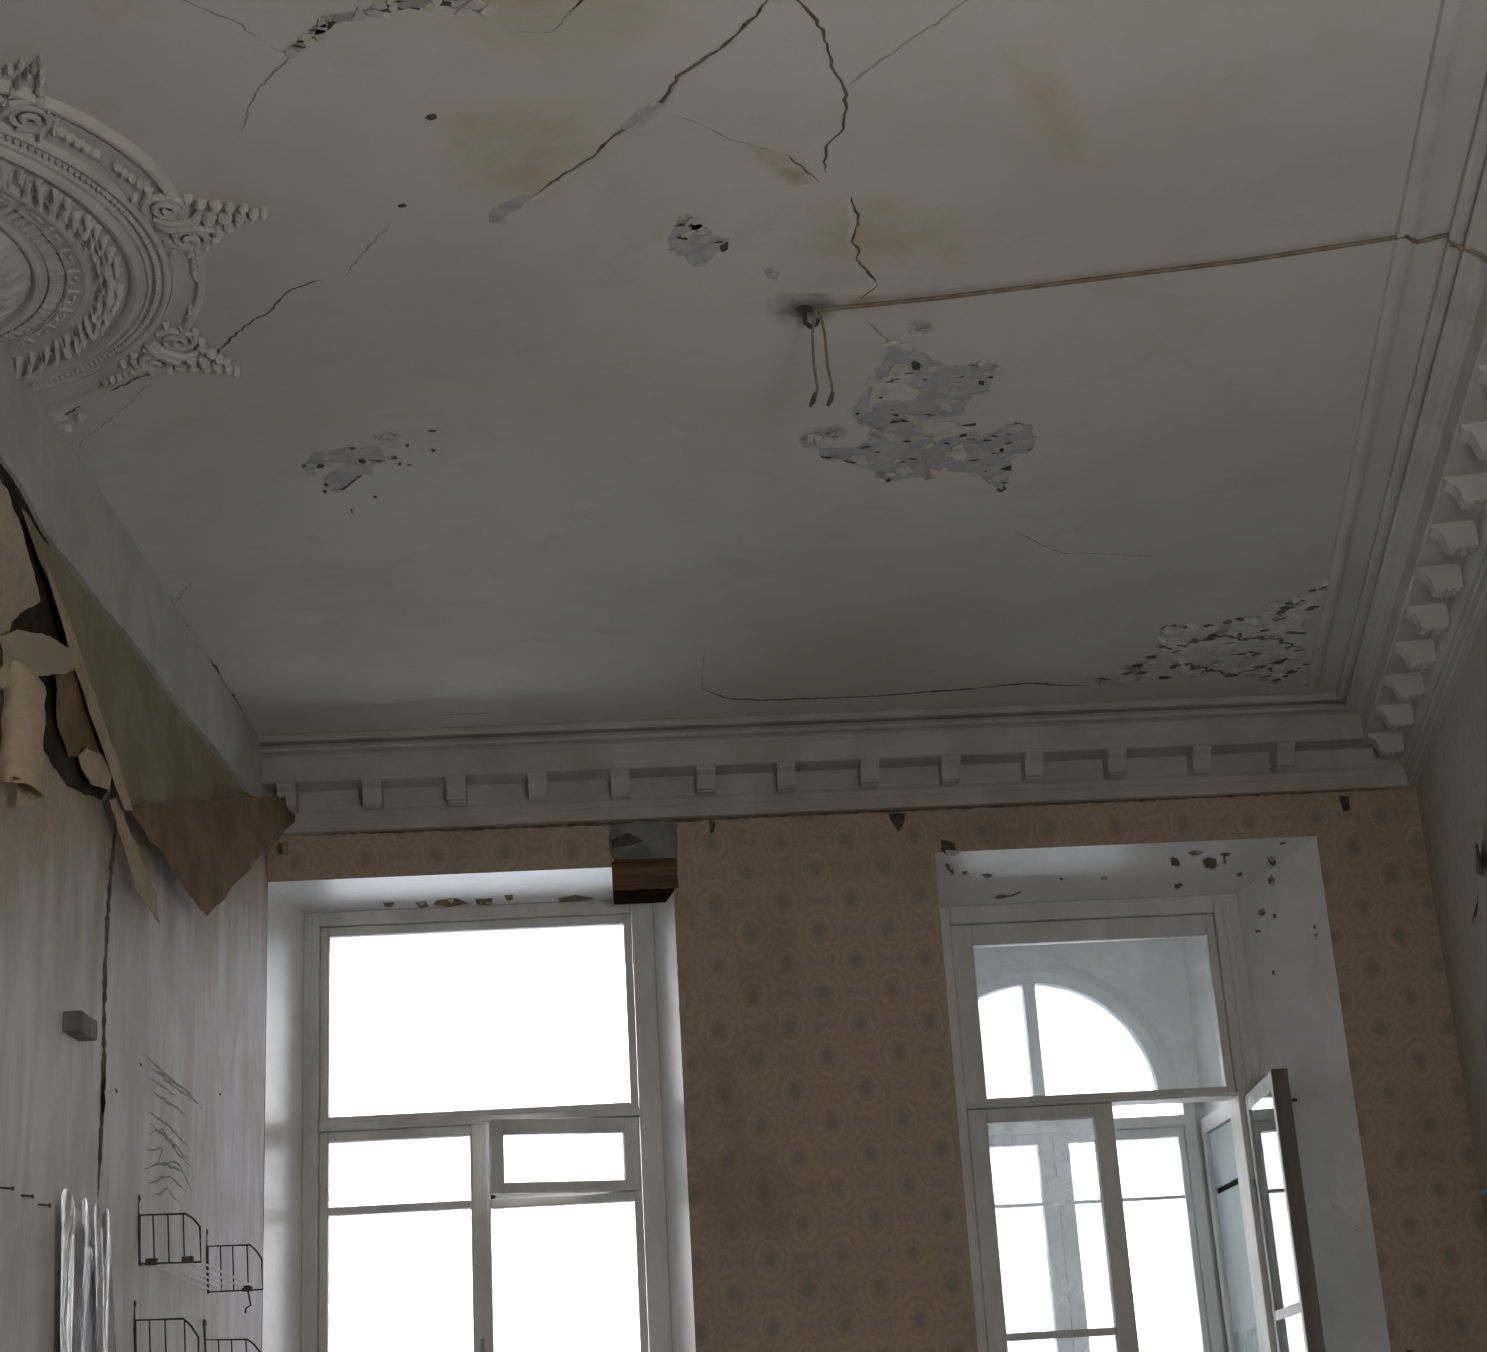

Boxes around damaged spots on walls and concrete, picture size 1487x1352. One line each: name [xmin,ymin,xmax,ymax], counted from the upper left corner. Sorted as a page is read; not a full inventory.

peeling [285,0,498,58]
crack [520,0,968,343]
peeling [668,213,729,268]
peeling [798,321,1039,493]
peeling [301,433,412,494]
peeling [1089,578,1329,688]
peeling [21,508,295,924]
spalling [941,840,992,879]
peeling [1171,851,1242,889]
peeling [1268,842,1286,886]
spalling [1473,810,1487,1086]